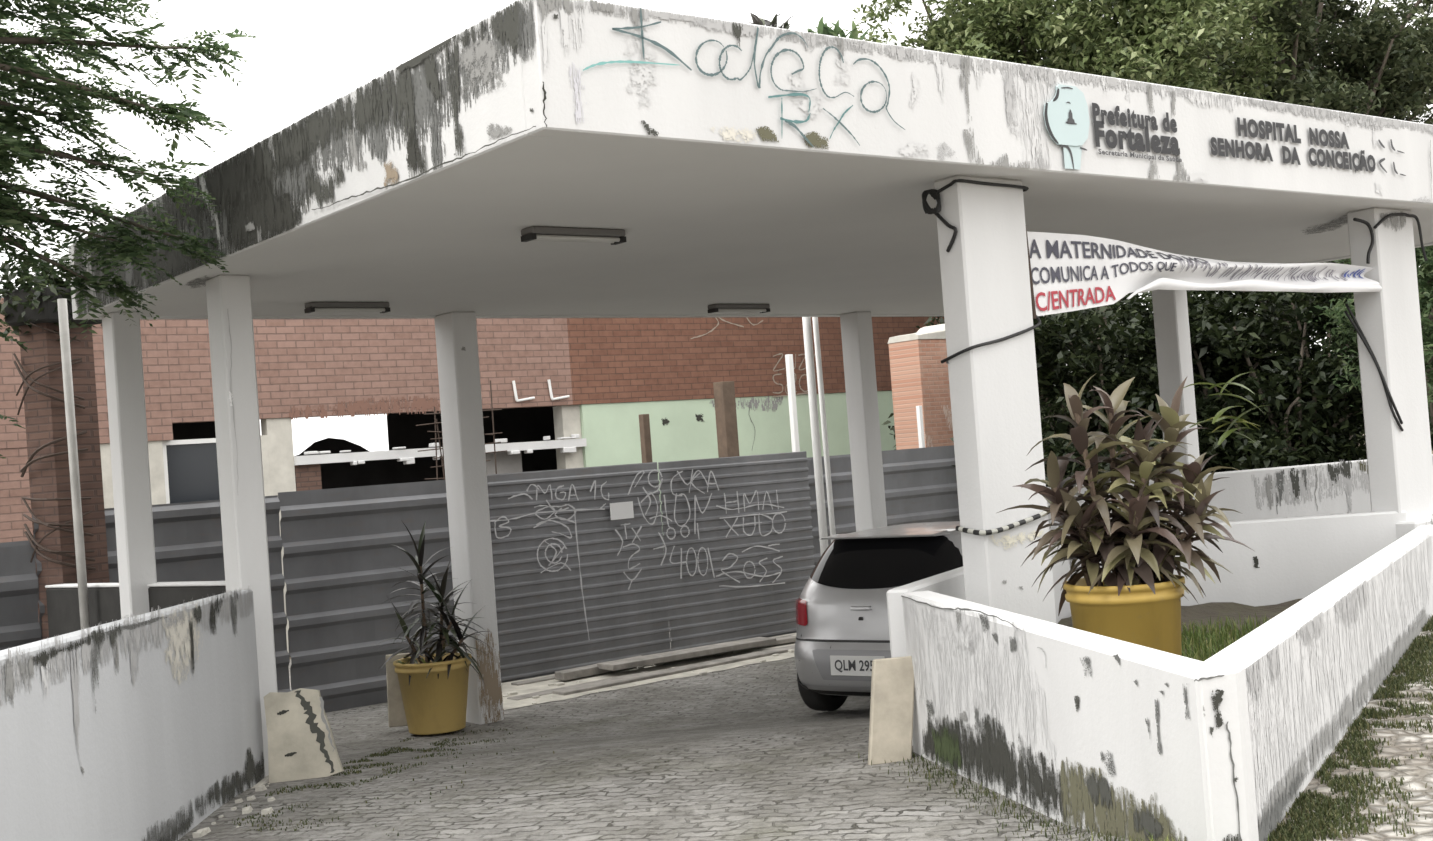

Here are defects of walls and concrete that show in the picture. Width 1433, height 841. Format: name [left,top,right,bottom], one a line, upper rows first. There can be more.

damp [73,0,1433,316]
damp [1251,459,1369,514]
damp [0,585,253,744]
crack [295,690,335,773]
damp [144,749,265,841]